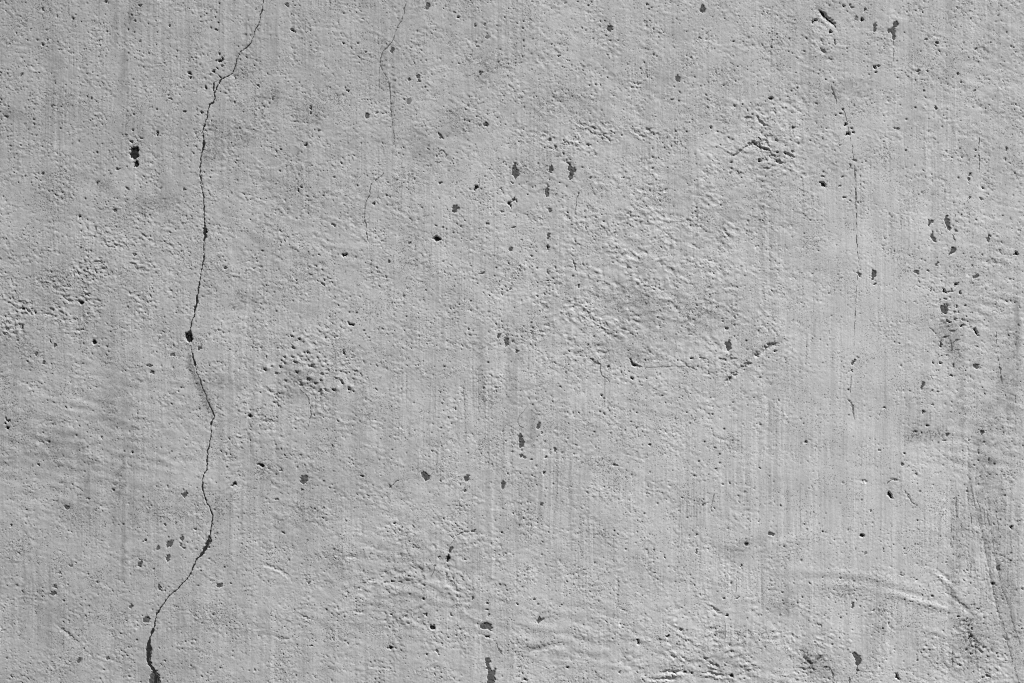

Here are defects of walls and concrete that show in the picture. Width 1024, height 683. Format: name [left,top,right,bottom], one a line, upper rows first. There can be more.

crack [146,0,264,683]